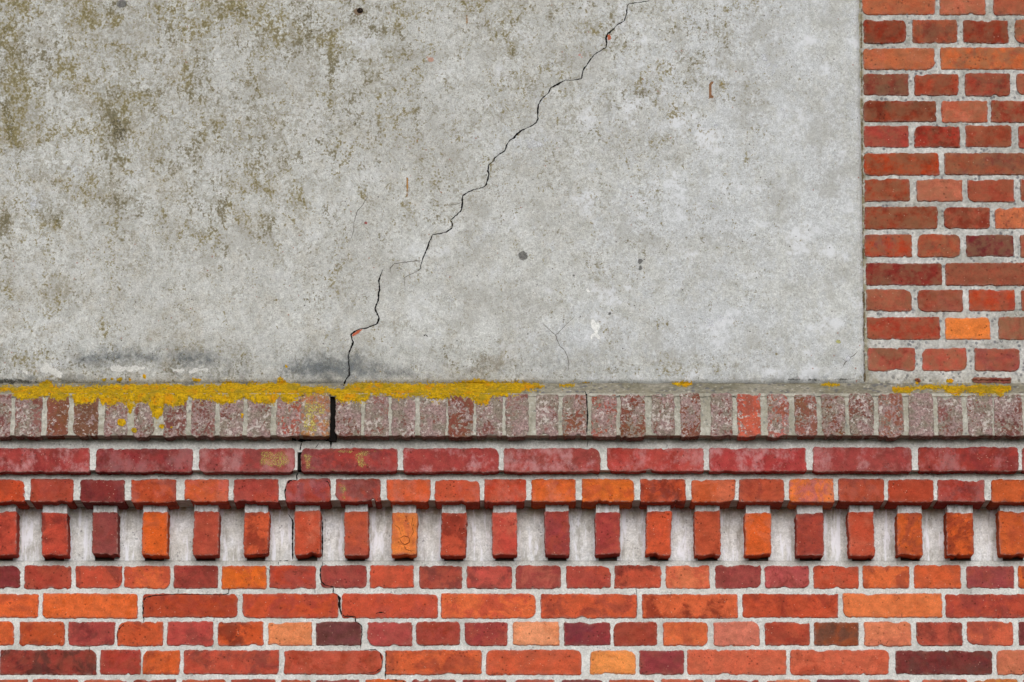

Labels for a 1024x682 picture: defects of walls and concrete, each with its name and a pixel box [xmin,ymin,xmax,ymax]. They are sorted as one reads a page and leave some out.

crack [265,1,647,575]